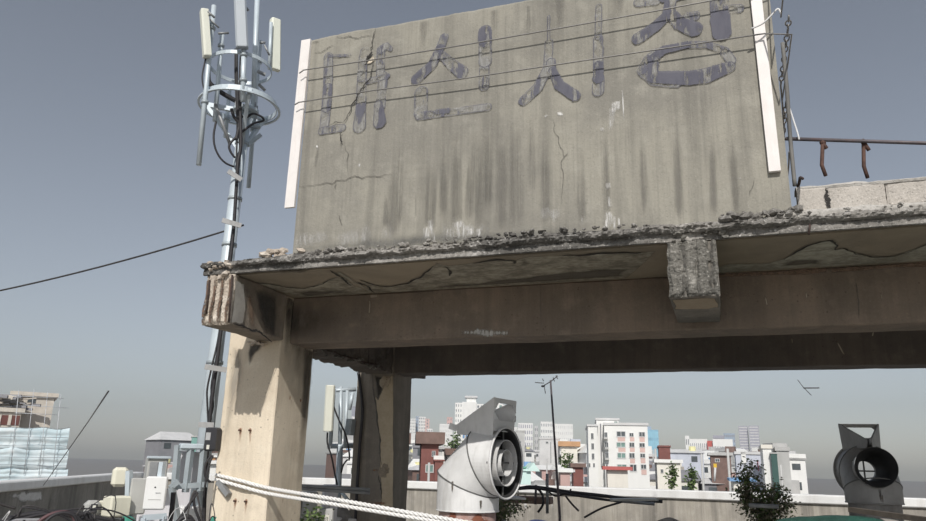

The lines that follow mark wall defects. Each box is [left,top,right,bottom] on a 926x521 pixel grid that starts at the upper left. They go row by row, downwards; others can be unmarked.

crack [303,28,386,187]
peeling [201,260,245,324]
spalling [259,242,410,258]
spalling [423,228,548,246]
peeling [360,251,655,292]
spalling [559,223,650,233]
peeling [668,205,926,309]